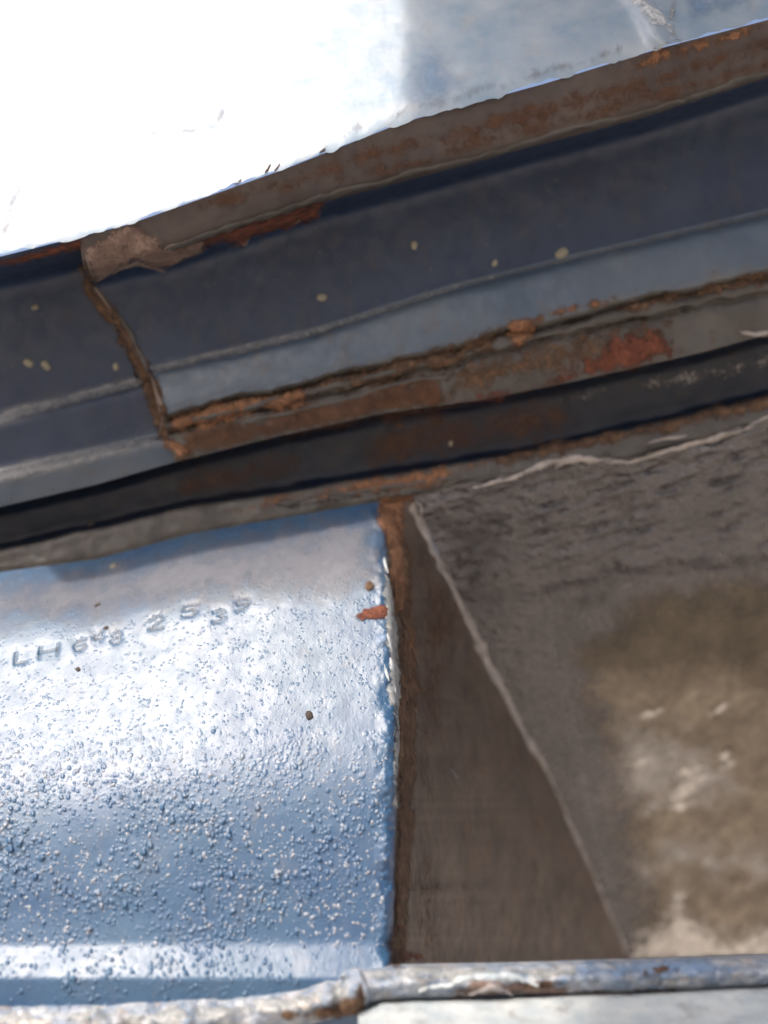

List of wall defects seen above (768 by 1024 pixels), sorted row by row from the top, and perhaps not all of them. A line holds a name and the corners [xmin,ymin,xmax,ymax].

corrosion [455,25,768,134]
peeling [84,72,768,283]
peeling [0,284,461,424]
corrosion [163,269,768,460]
corrosion [252,396,768,967]
water stain [625,737,737,815]
water stain [631,892,768,958]